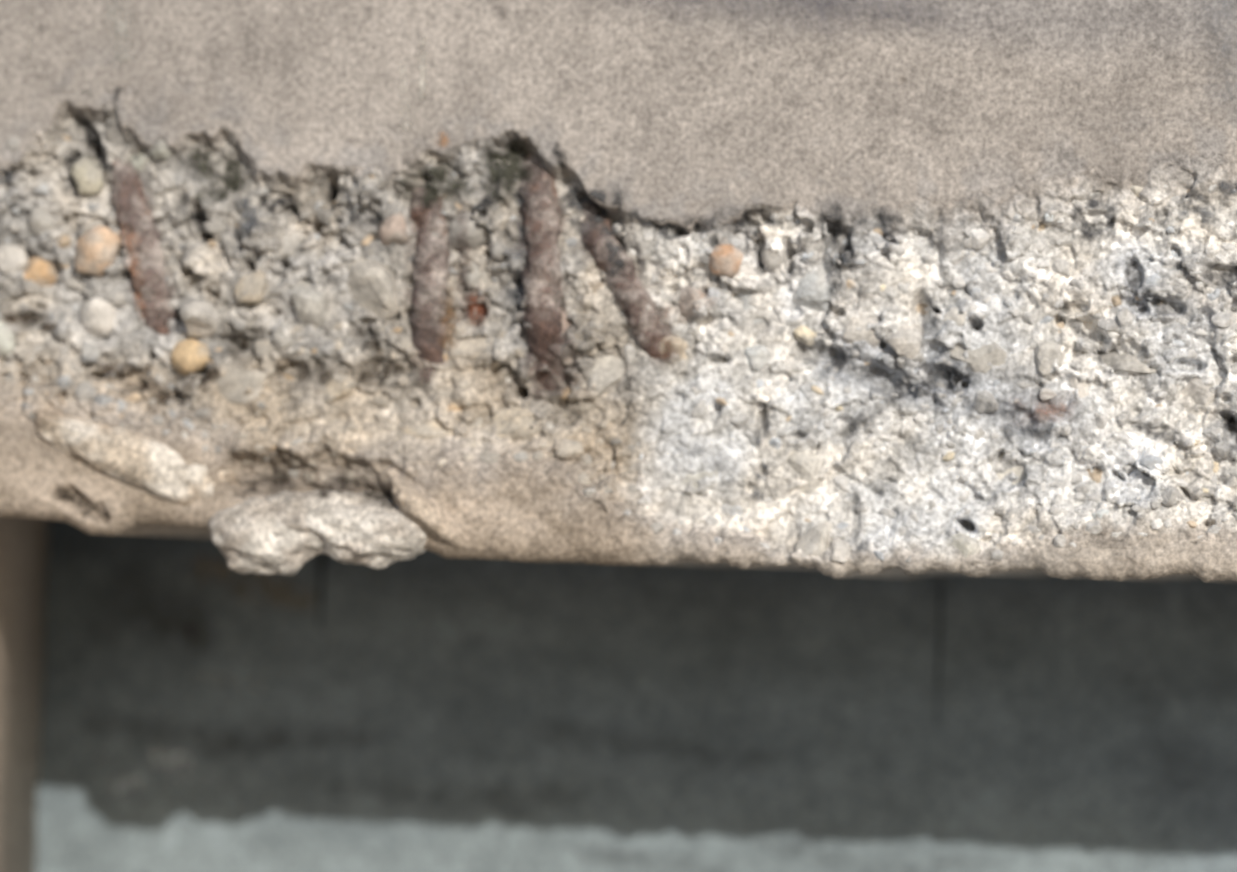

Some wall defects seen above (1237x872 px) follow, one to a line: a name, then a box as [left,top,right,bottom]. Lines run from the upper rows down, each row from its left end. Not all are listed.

rust [106,159,179,335]
spalling [0,103,660,521]
rust [409,180,485,380]
rust [517,152,568,391]
rust [578,201,676,359]